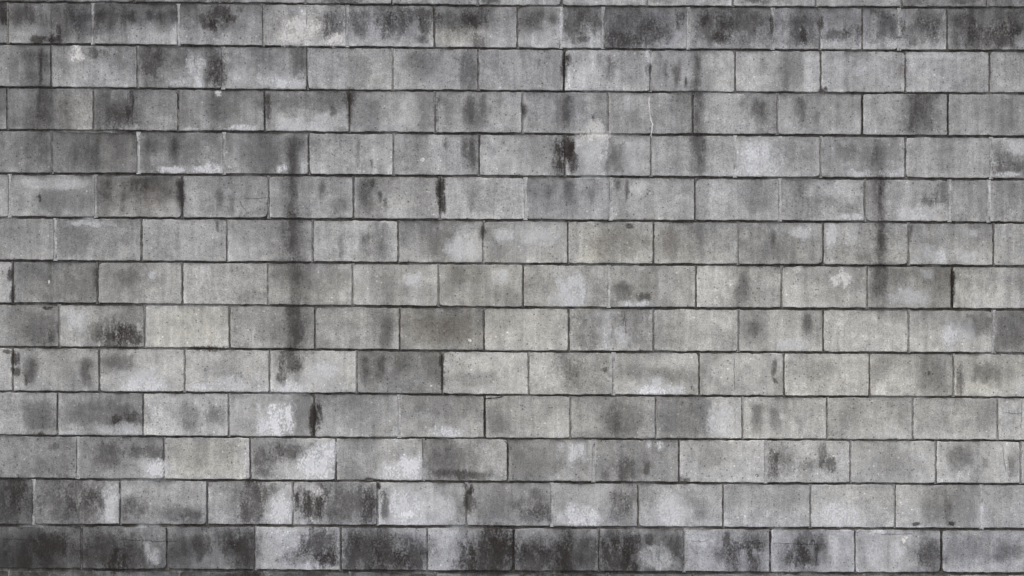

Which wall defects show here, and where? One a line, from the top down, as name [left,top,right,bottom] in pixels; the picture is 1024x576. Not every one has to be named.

leakage [278,14,344,46]
leakage [552,119,610,175]
leakage [436,179,445,212]
leakage [118,326,141,346]
leakage [104,490,118,523]
leakage [377,454,425,525]
leakage [557,502,599,526]
leakage [823,501,857,558]
leakage [376,533,427,570]
leakage [470,526,517,576]
leakage [602,534,652,572]
leakage [727,542,763,572]